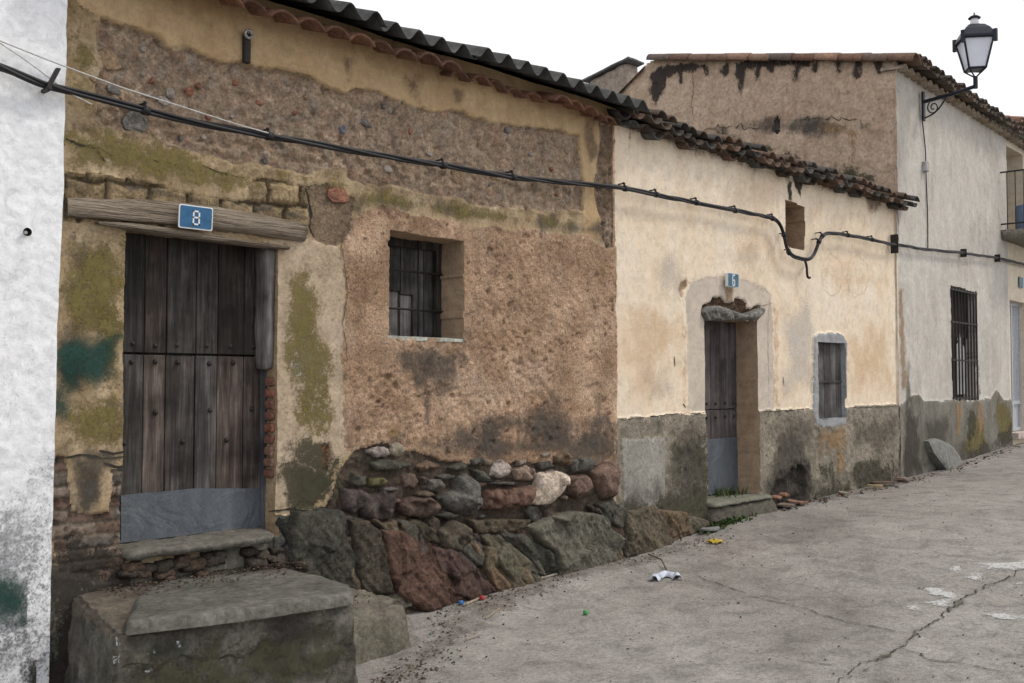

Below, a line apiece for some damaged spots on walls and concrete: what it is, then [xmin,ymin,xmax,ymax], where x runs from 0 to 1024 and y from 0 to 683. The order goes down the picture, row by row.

leakage [649,60,818,104]
leakage [835,61,882,79]
spalling [63,17,616,249]
spalling [701,288,777,324]
leakage [402,346,464,417]
leakage [277,434,347,511]
spalling [339,442,621,524]
leakage [425,403,614,463]
leakage [767,378,949,504]
spalling [0,456,127,594]
crack [702,568,1024,682]